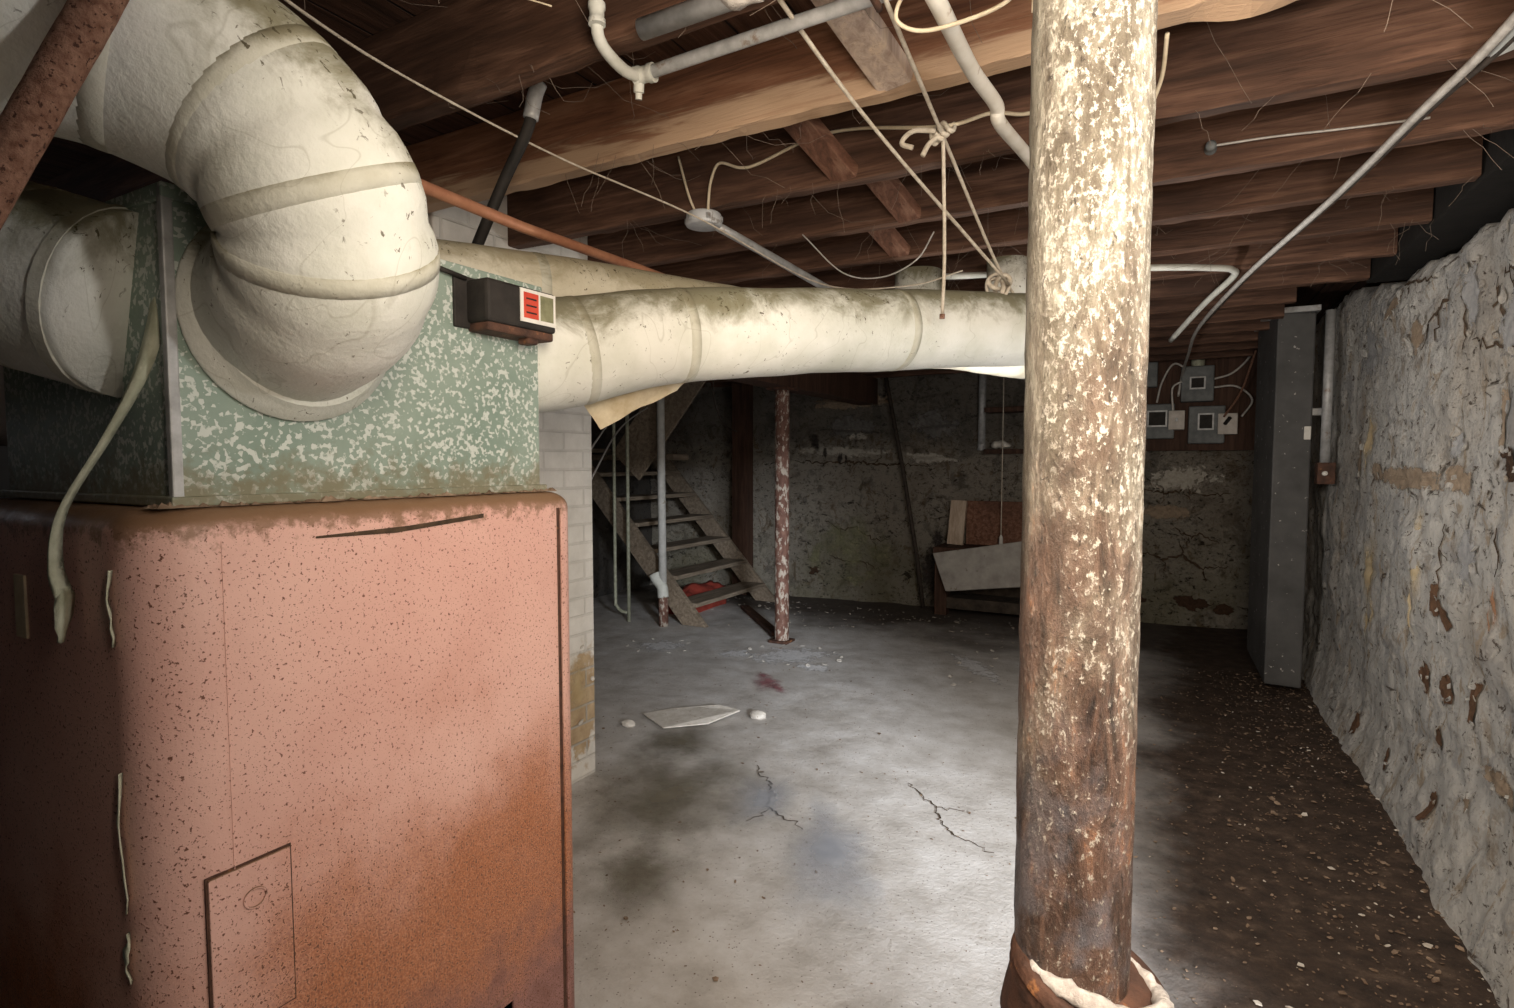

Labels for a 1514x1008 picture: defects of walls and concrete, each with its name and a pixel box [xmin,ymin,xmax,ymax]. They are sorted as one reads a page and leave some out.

peeling [1459,256,1514,483]
peeling [1356,426,1472,495]
crack [1142,487,1230,582]
spalling [1426,584,1452,632]
spalling [1418,661,1483,729]
spalling [1434,725,1442,750]
crack [746,765,801,828]
crack [909,783,994,853]
spalling [1415,783,1437,824]